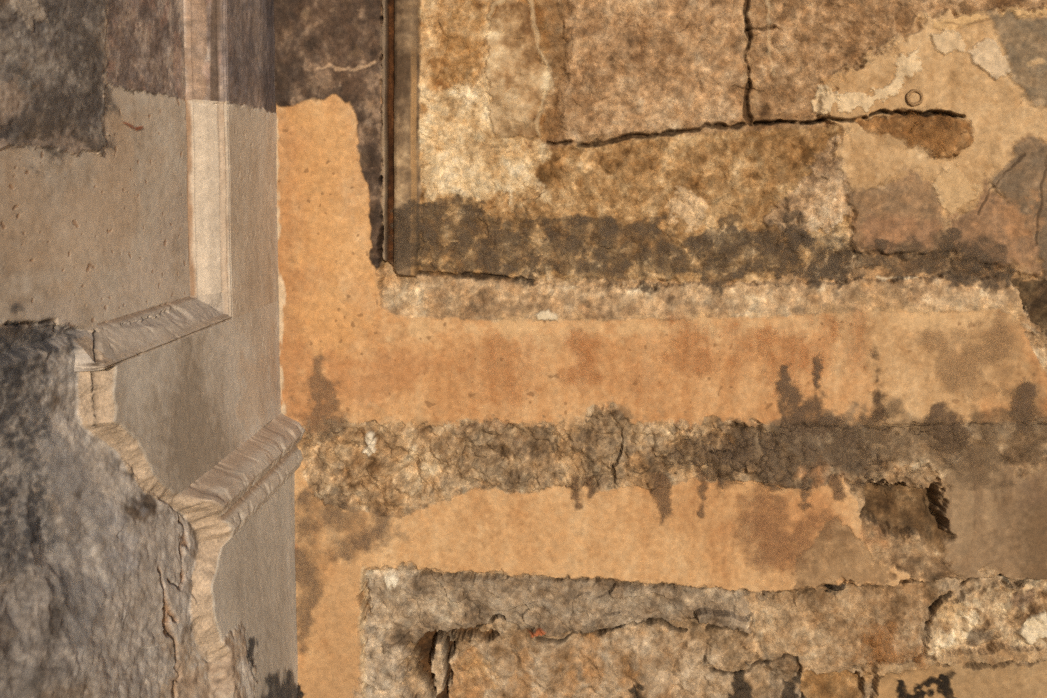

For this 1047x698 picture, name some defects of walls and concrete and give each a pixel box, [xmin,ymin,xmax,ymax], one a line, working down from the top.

crack [547,0,869,147]
spalling [811,48,974,157]
flaking render [931,28,1011,80]
damp [784,211,849,272]
crack [0,318,57,331]
peeling [362,431,377,456]
damp [668,358,1047,565]
damp [571,477,594,509]
damp [650,472,671,523]
crack [157,516,188,697]
peeling [384,572,399,589]
spalling [415,627,495,698]